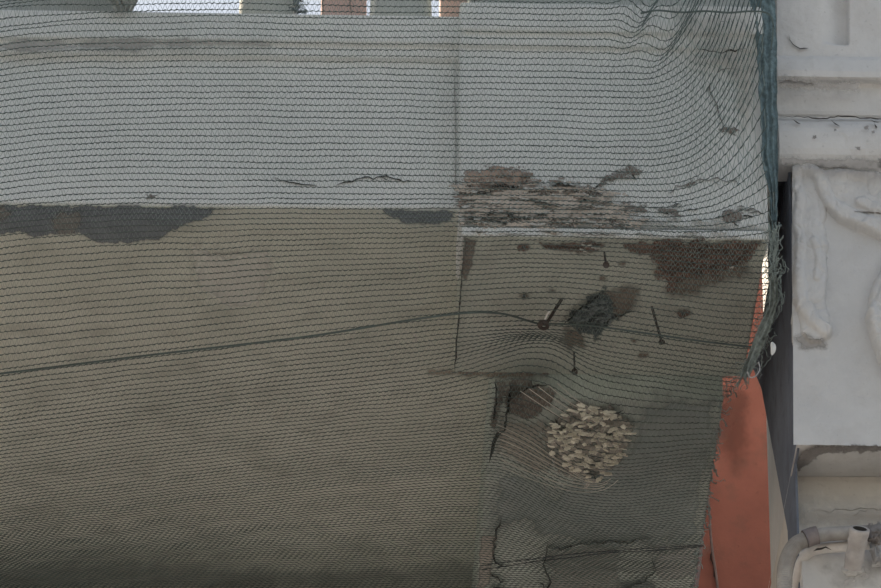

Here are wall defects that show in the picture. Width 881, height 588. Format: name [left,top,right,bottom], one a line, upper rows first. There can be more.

crack [787,115,880,128]
crack [339,175,410,184]
peeling [449,166,761,297]
spalling [561,287,639,349]
spalling [489,377,556,462]
flaking render [542,402,637,488]
crack [490,517,503,588]
crack [540,538,649,588]